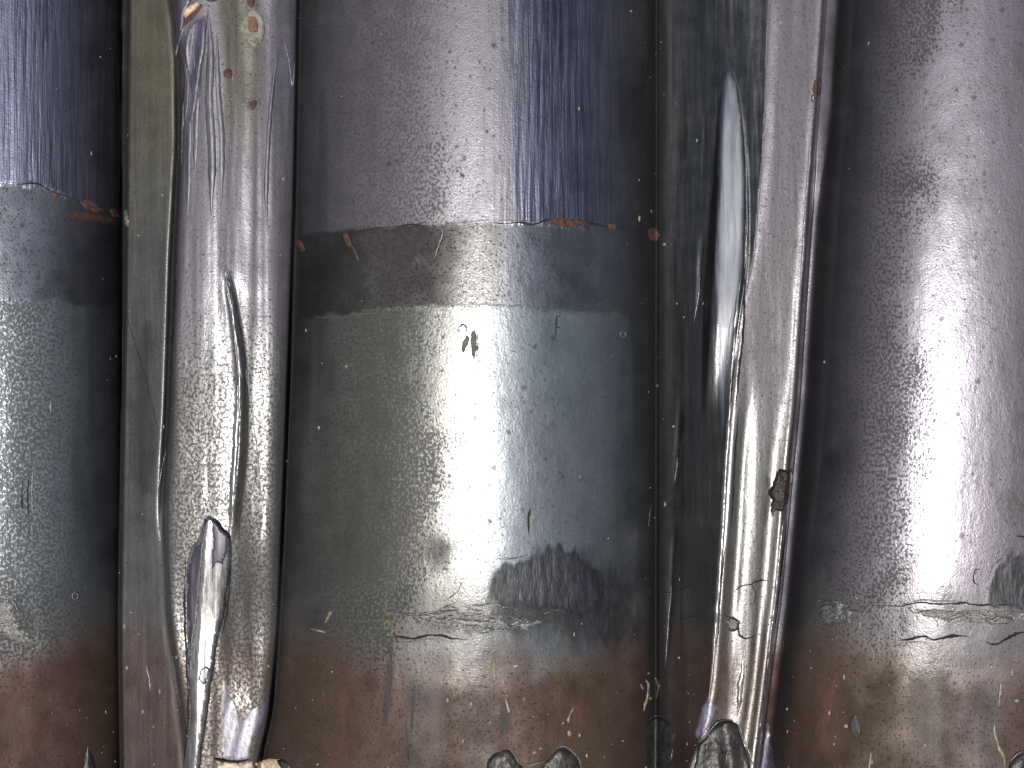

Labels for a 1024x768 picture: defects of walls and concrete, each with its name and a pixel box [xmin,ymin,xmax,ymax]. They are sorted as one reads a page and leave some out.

rust [240,0,268,47]
crack [869,599,1008,607]
spalling [183,516,291,768]
crack [382,634,468,643]
crack [901,631,1024,646]